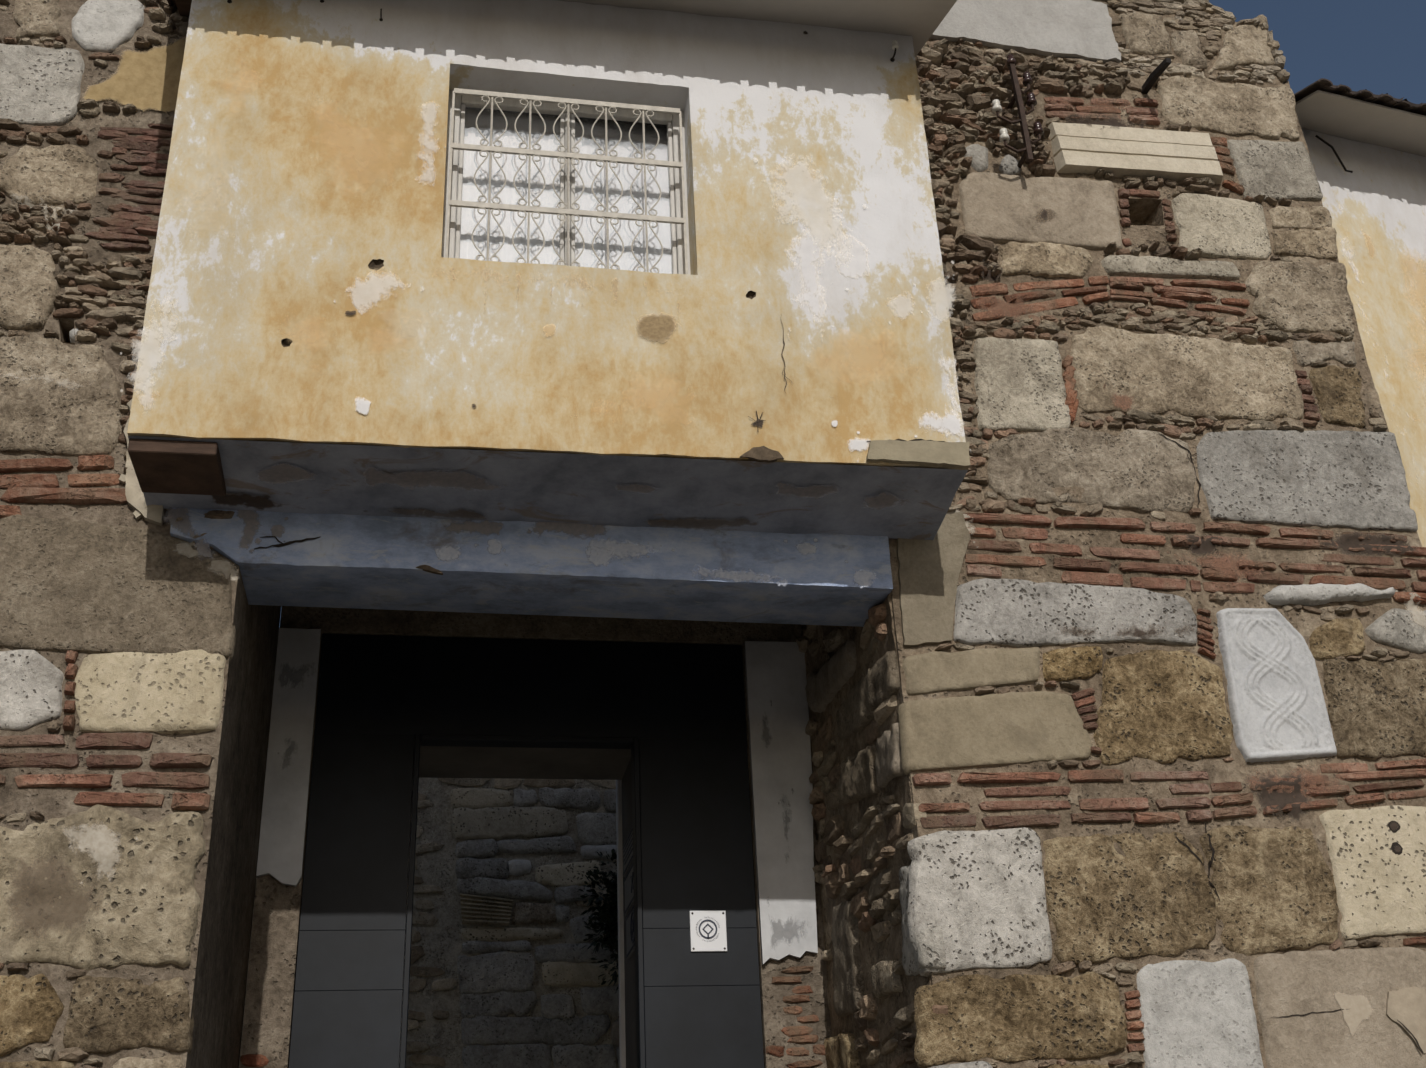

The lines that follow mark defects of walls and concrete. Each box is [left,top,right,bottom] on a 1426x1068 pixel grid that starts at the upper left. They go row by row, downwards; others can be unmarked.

peeling [334,259,402,315]
peeling [890,282,954,319]
crack [781,321,792,393]
spalling [355,398,371,415]
peeling [915,358,963,437]
peeling [848,431,870,451]
damp [212,493,285,510]
crack [254,536,321,550]